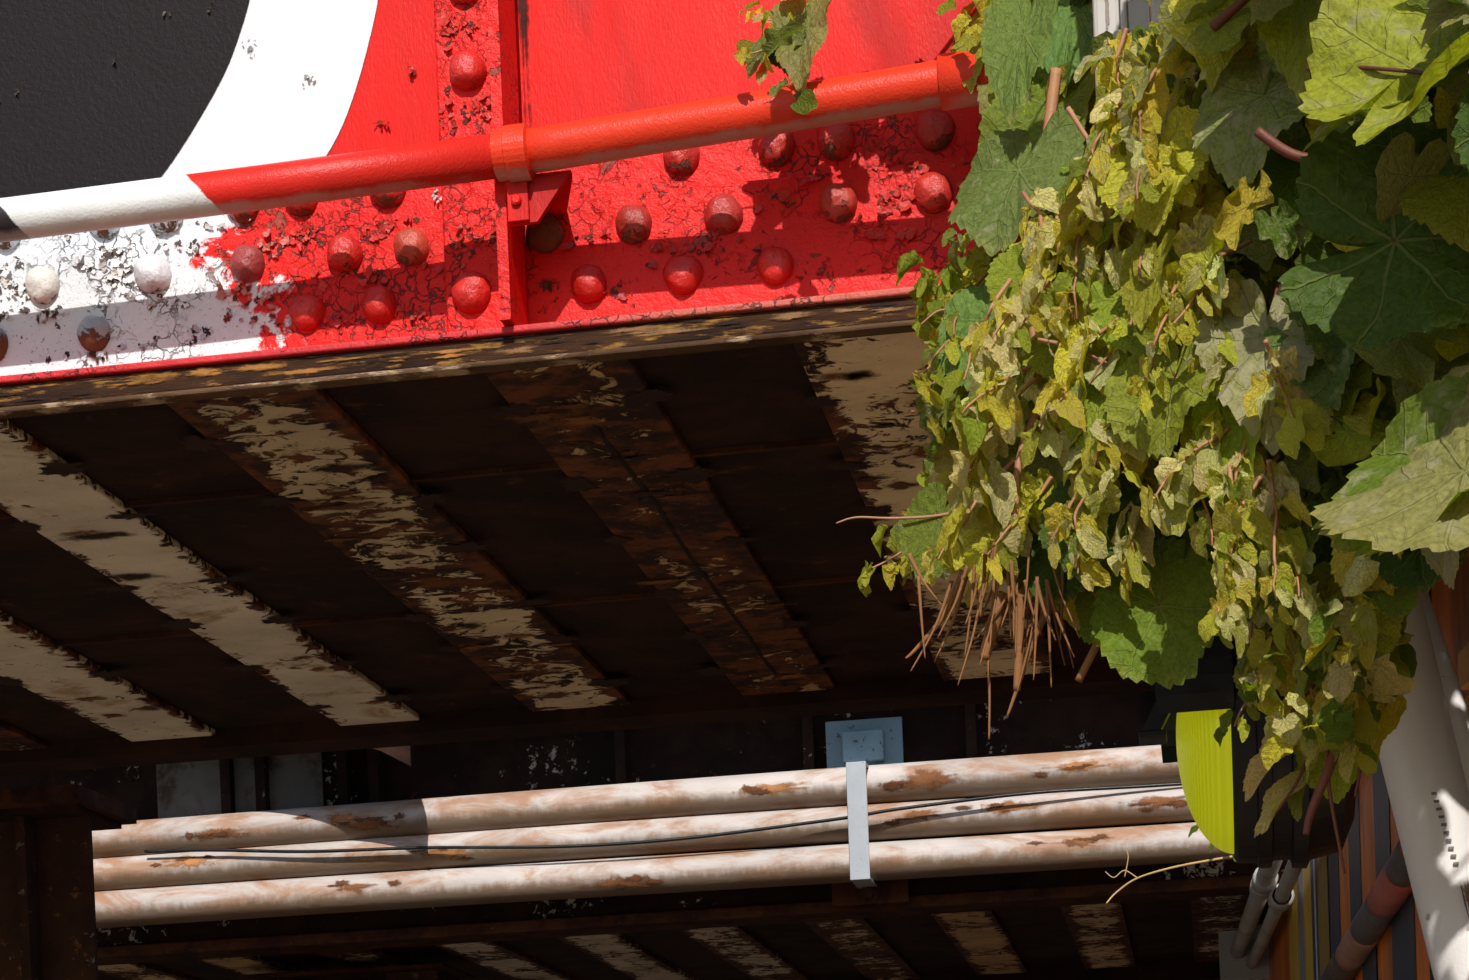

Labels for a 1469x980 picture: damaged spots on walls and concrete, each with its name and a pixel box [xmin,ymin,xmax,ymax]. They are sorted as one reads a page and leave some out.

peeling [439,85,491,136]
peeling [64,219,326,302]
peeling [412,221,497,281]
peeling [0,256,68,329]
peeling [145,276,289,345]
peeling [29,335,158,363]
rust [739,783,807,795]
rust [879,770,955,791]
rust [883,801,1039,826]
rust [1120,795,1188,811]
rust [150,828,248,868]
rust [328,880,401,893]